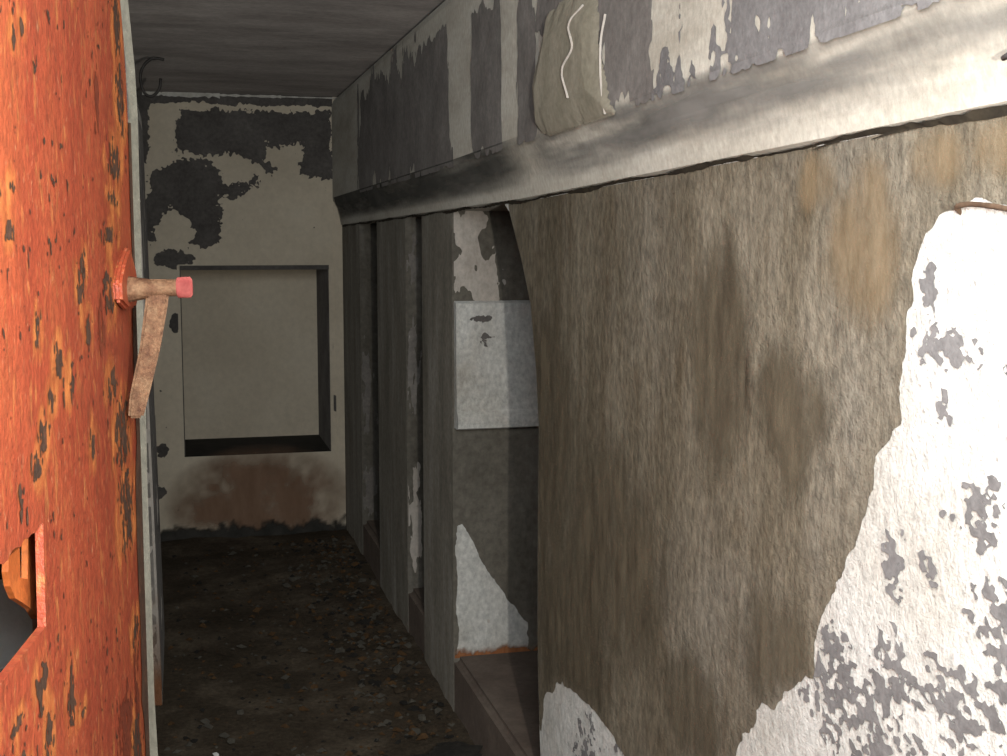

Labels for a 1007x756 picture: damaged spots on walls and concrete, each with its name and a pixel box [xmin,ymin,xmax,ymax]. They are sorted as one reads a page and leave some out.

corrosion [5,214,31,267]
corrosion [86,0,127,207]
peeling [126,83,333,279]
peeling [357,24,453,192]
peeling [470,0,502,159]
peeling [598,0,696,110]
peeling [708,0,940,81]
corrosion [93,365,134,575]
water stain [160,515,346,542]
spalling [454,115,1007,756]
corrosion [4,652,86,756]
corrosion [102,616,144,756]